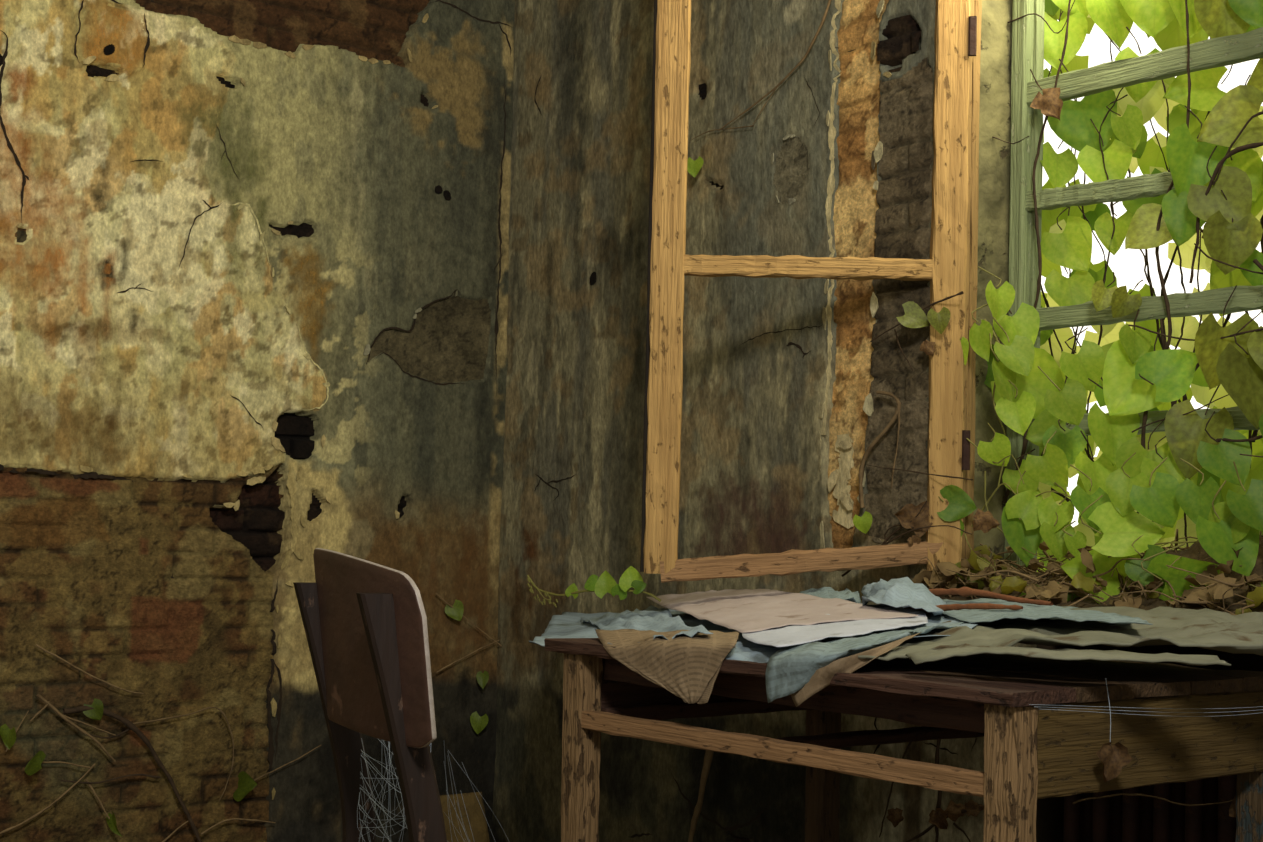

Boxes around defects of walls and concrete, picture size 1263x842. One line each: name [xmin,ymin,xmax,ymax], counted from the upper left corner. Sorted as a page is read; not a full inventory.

crack [74,0,154,69]
flaking render [135,0,430,67]
crack [0,31,29,220]
crack [216,125,239,179]
flaking render [825,0,933,259]
crack [179,200,219,267]
flaking render [228,202,314,277]
flaking render [816,279,930,549]
flaking render [0,305,331,842]